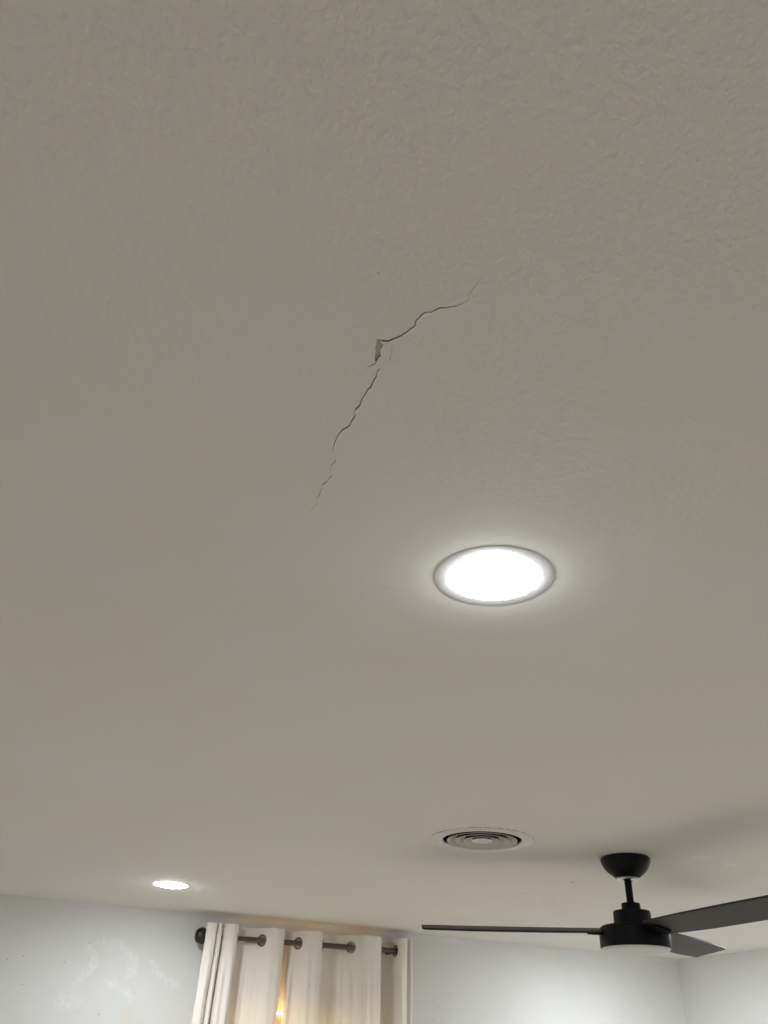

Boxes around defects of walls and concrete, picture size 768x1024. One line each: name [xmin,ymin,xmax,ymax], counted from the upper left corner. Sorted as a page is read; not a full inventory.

crack [310,268,490,513]